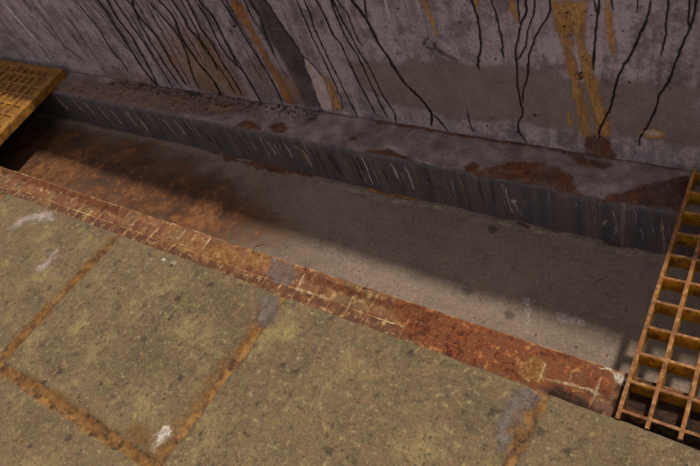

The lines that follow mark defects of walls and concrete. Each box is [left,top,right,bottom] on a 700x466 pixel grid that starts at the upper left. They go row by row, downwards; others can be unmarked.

rust [231,0,301,103]
crack [265,0,322,110]
rust [376,1,616,169]
rust [0,122,273,270]
rust [466,161,581,196]
rust [604,176,690,211]
rust [302,271,616,400]